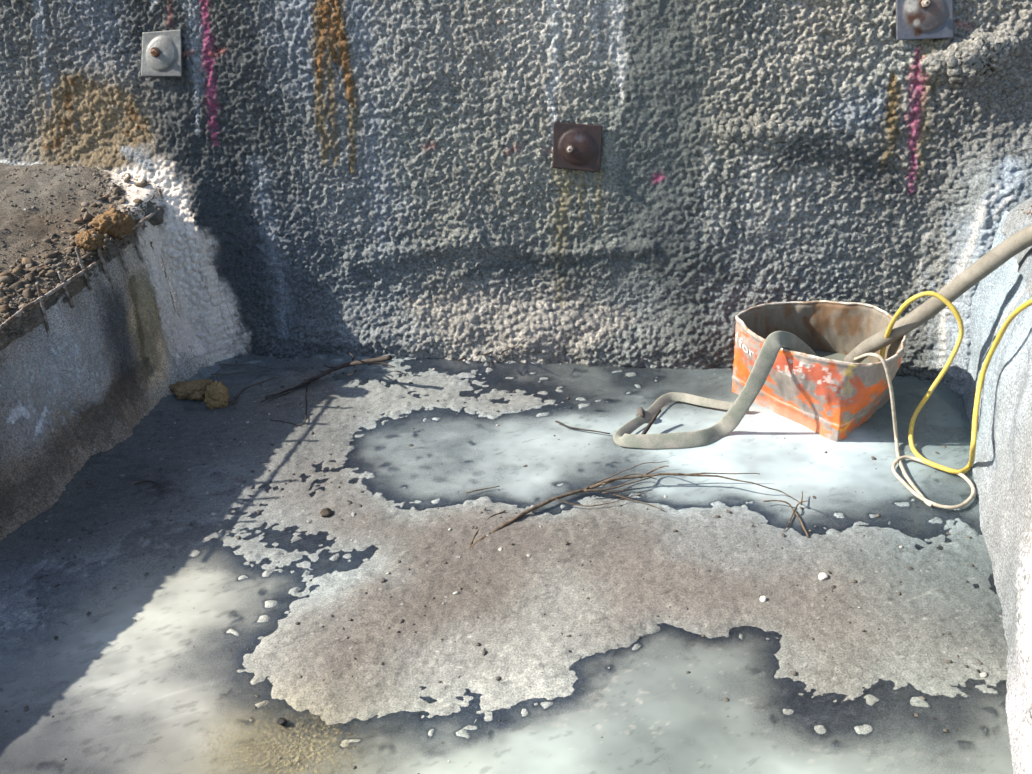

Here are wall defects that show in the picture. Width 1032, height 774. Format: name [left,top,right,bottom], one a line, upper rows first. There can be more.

rust [311,0,358,173]
spalling [118,188,166,274]
spalling [0,234,113,334]
peeling [0,336,101,441]